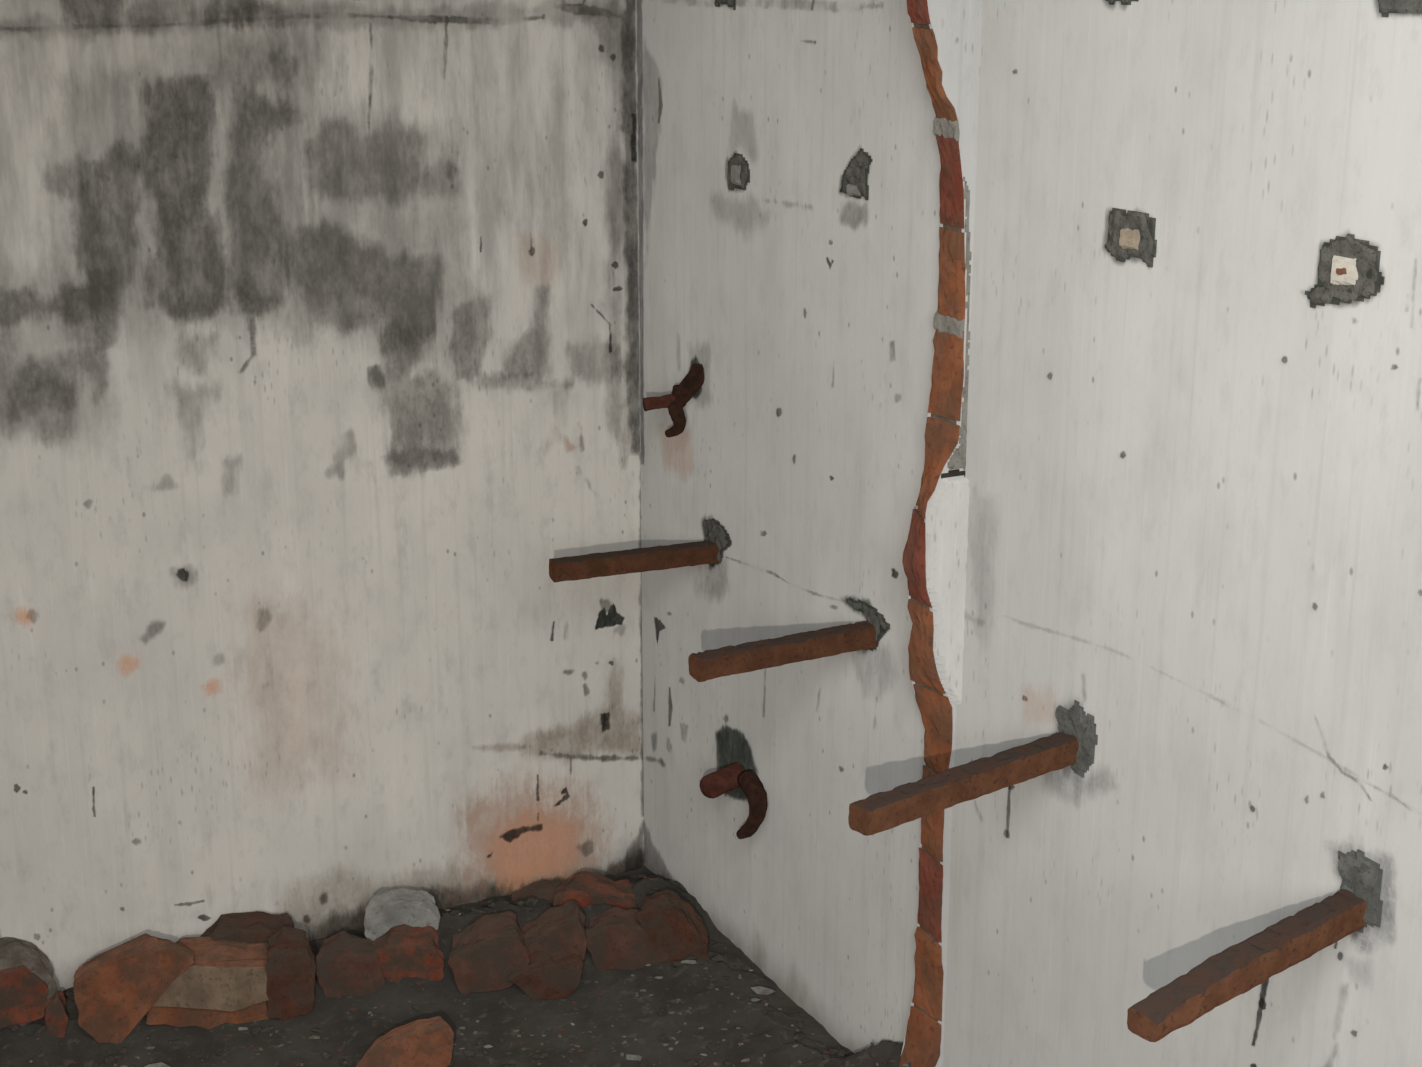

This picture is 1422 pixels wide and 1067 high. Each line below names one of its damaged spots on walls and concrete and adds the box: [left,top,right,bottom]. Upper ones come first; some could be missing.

water stain [146,79,224,318]
water stain [369,366,381,384]
flaking render [892,0,971,778]
corrosion [549,540,719,583]
corrosion [688,621,879,682]
corrosion [848,732,1079,836]
flaking render [899,810,944,1067]
corrosion [1127,889,1367,1042]